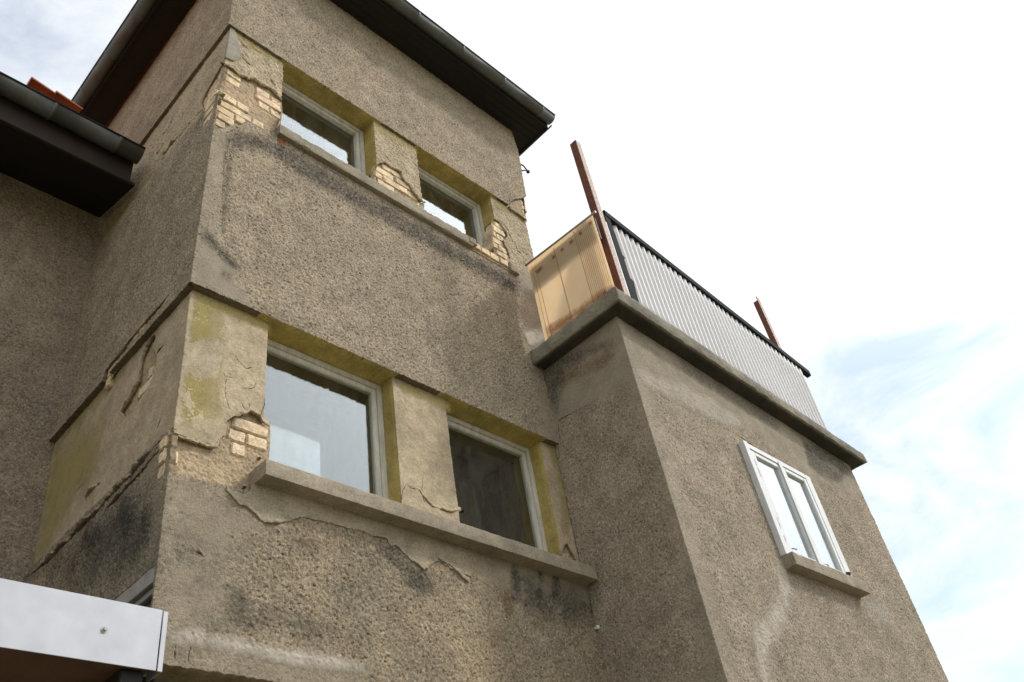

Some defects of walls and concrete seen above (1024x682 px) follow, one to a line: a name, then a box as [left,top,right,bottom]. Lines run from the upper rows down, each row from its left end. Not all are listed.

spalling [203,27,283,130]
spalling [370,161,426,209]
water stain [234,134,514,290]
spalling [469,218,509,271]
peeling [157,292,478,577]
crack [400,483,464,513]
crack [438,555,470,583]